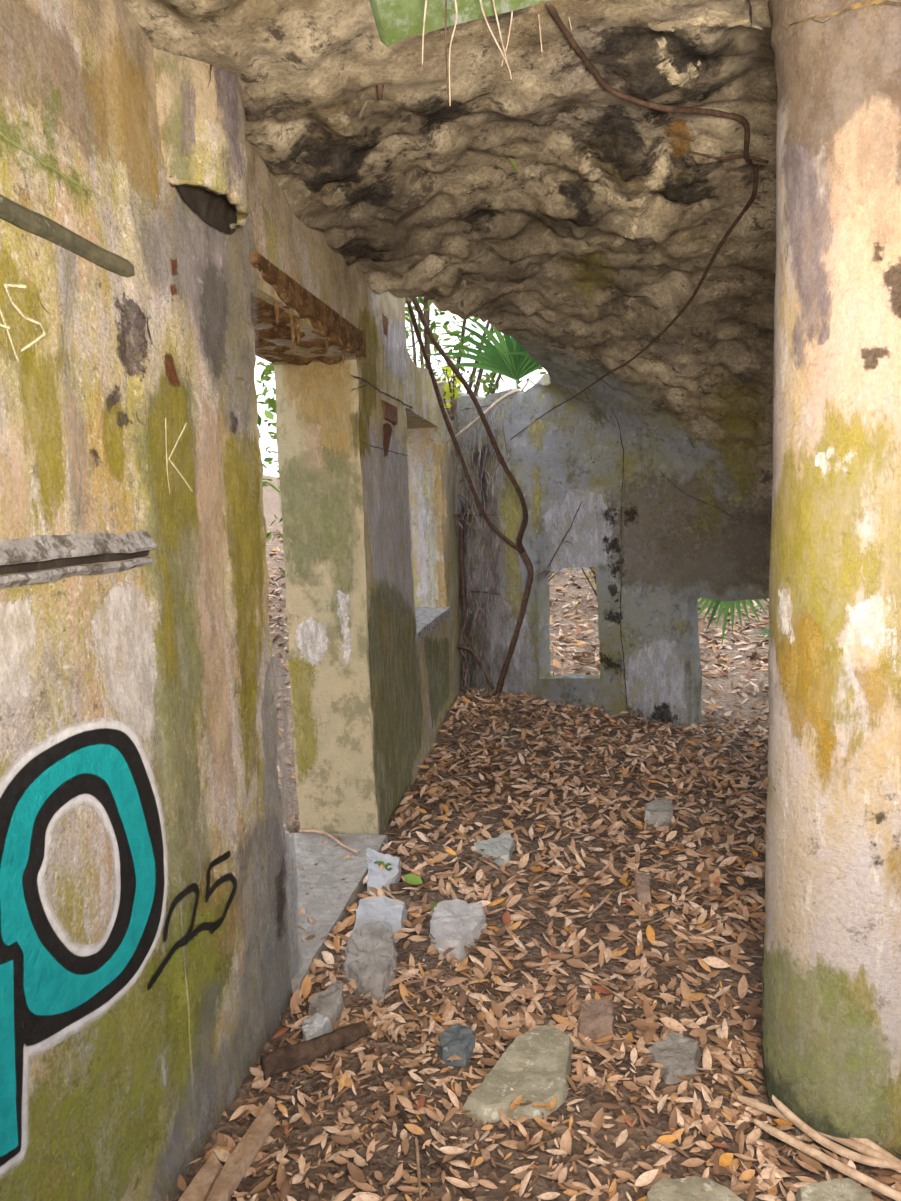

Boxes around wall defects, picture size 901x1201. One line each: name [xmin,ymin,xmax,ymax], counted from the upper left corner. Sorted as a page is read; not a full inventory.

crack [0,91,106,199]
water stain [288,118,393,207]
water stain [342,242,388,266]
water stain [398,92,471,142]
water stain [456,199,499,234]
water stain [559,0,901,441]
water stain [147,206,258,795]
water stain [284,361,541,632]
water stain [880,509,901,697]
water stain [288,659,317,782]
water stain [800,634,855,764]
water stain [837,970,879,1026]